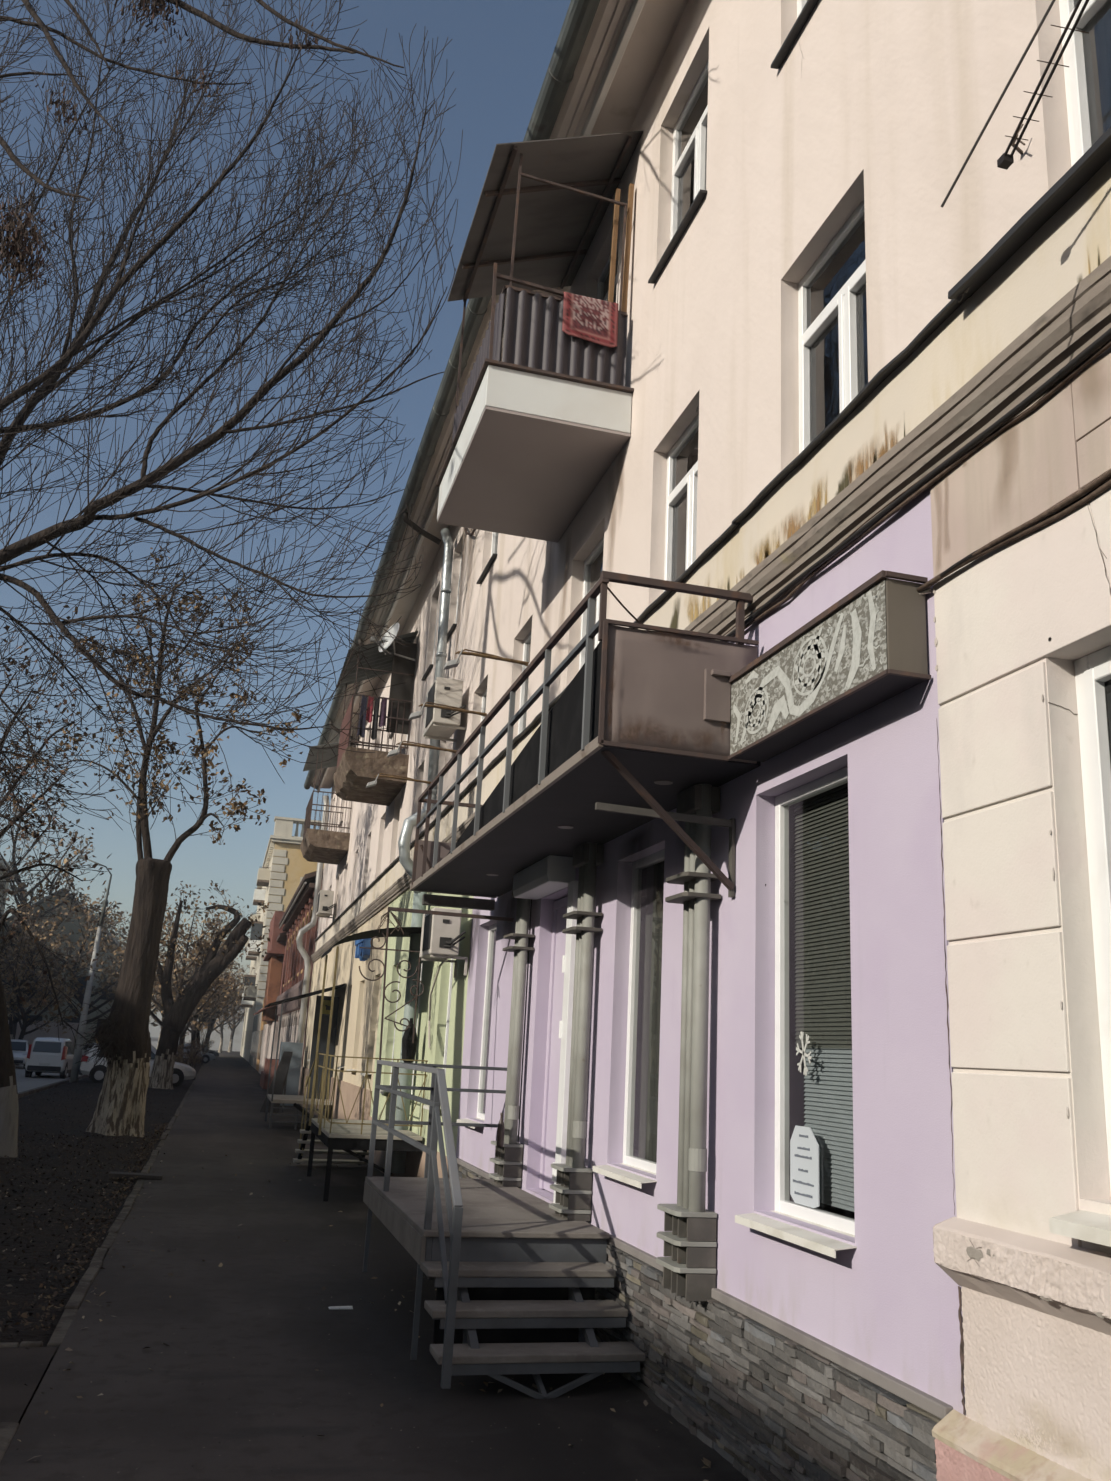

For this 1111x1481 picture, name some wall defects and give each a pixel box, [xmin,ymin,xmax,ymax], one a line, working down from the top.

rust [757,428,905,565]